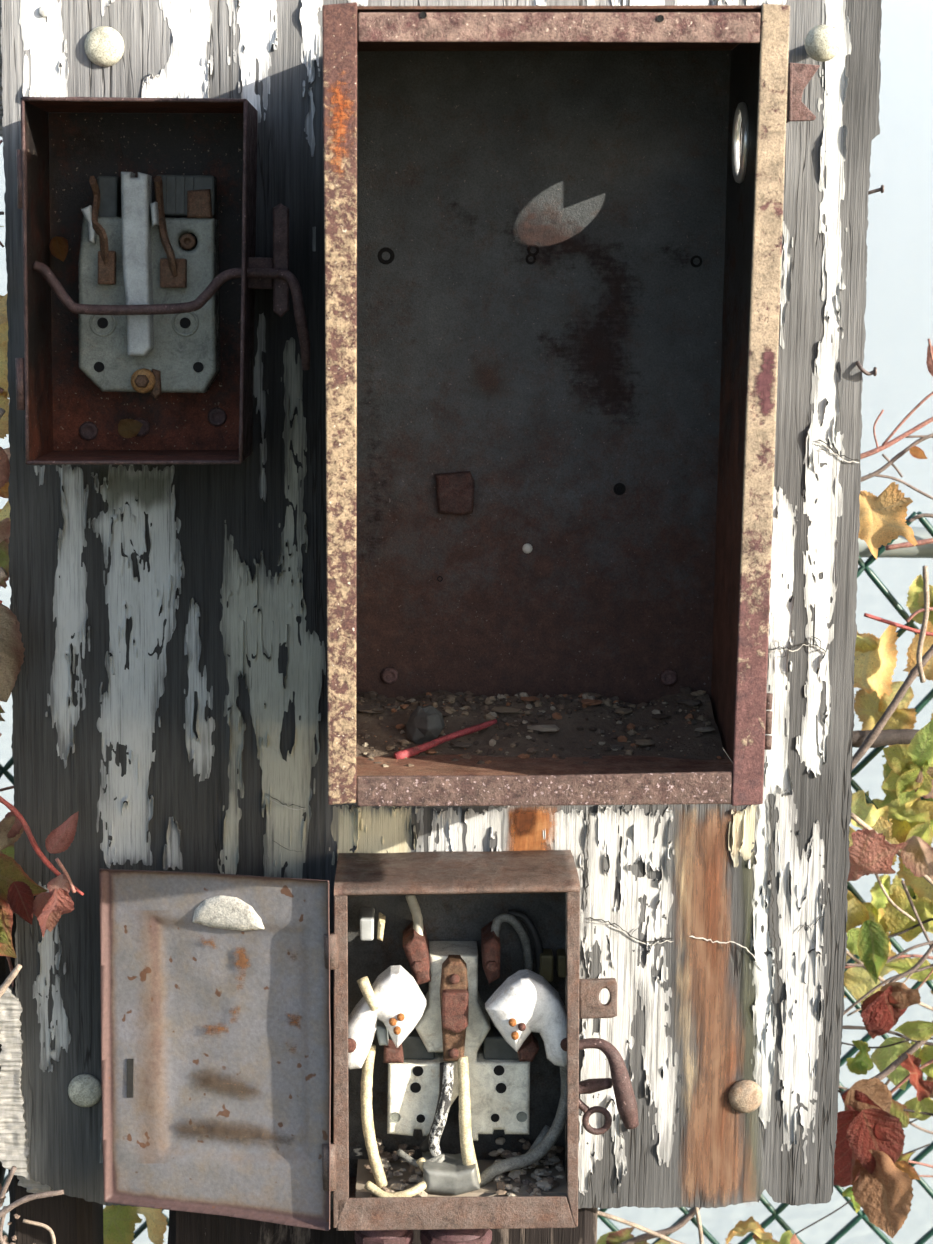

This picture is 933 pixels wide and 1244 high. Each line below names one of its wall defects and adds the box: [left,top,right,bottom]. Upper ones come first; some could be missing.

peeling [19,0,69,97]
peeling [142,0,278,143]
peeling [300,0,323,157]
corrosion [330,82,354,173]
corrosion [511,213,635,415]
corrosion [754,347,776,416]
peeling [34,313,326,879]
peeling [728,0,852,1164]
peeling [543,805,681,1195]
crack [585,798,824,1006]
corrosion [681,812,751,1203]
corrosion [177,1122,278,1141]